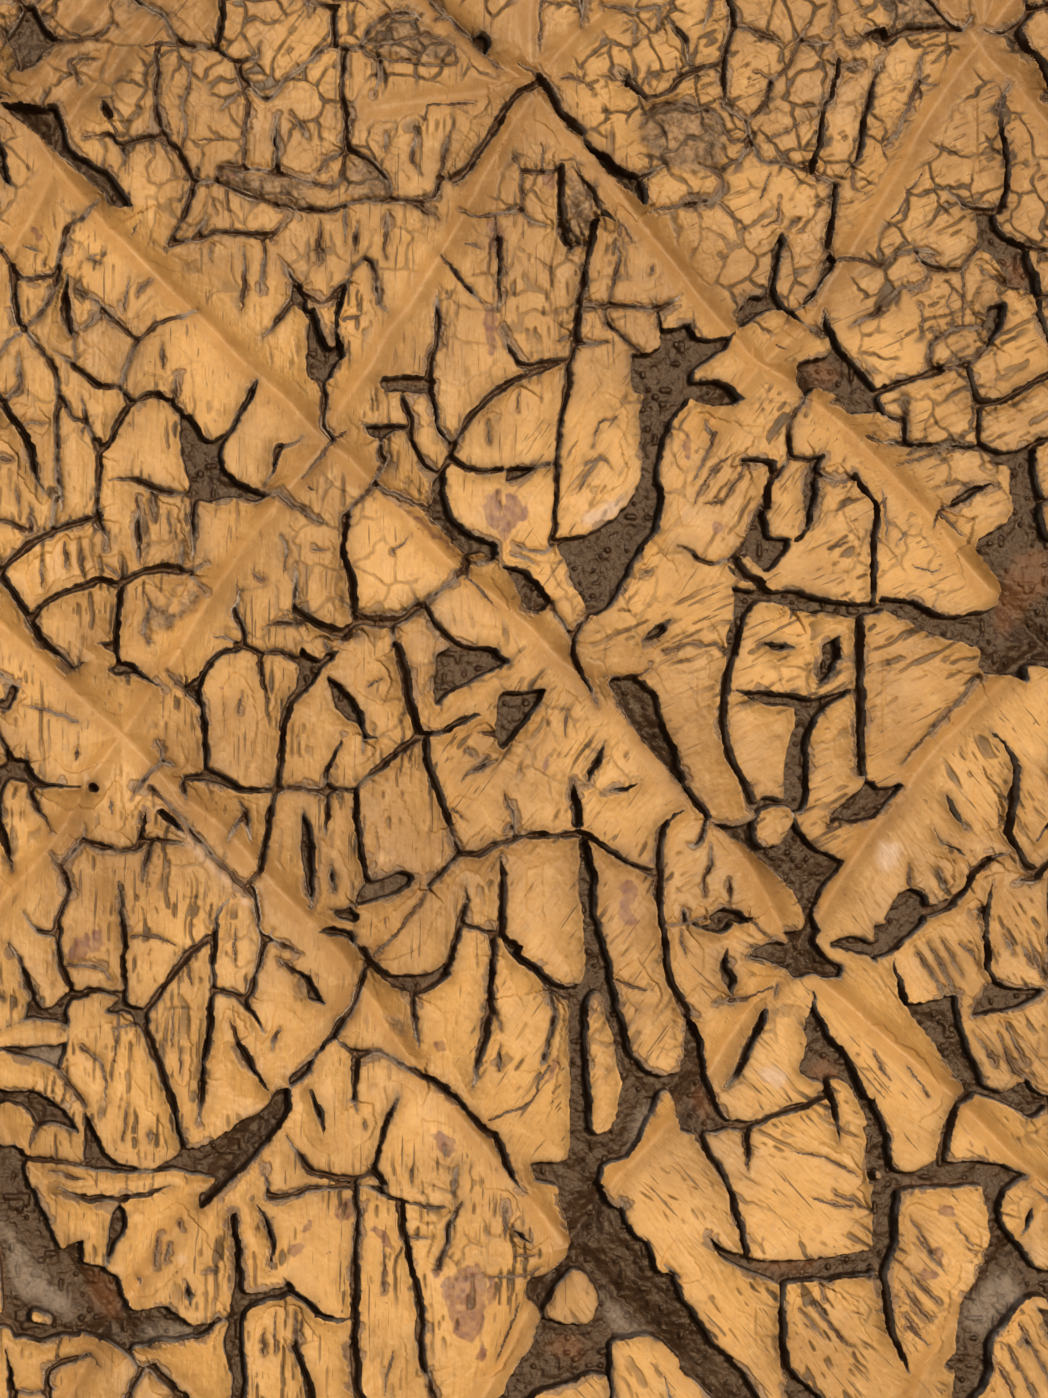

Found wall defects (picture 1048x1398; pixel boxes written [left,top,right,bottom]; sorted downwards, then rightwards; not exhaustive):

crack [578,0,1048,467]
peeling [179,379,271,504]
crack [0,0,795,1398]
peeling [346,0,1048,980]
crack [693,398,964,778]
rust [988,545,1048,641]
rust [77,1261,129,1325]
peeling [0,646,1048,1398]
rust [748,1257,829,1279]
rust [803,1053,846,1092]
crack [672,1049,981,1377]
crack [893,731,1048,1107]